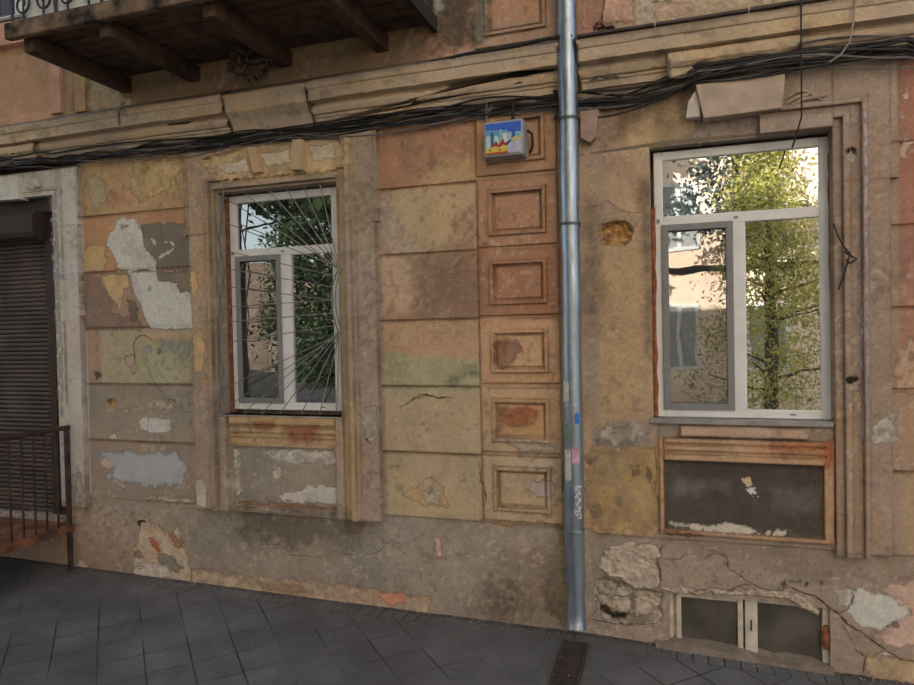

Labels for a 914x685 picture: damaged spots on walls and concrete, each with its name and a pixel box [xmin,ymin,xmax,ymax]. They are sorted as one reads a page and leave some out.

spalling [581,0,792,31]
peeling [80,217,206,372]
peeling [846,109,898,445]
crack [400,394,449,407]
peeling [100,450,208,508]
peeling [133,517,432,613]
peeling [267,448,336,479]
peeling [279,484,337,504]
spalling [593,541,820,626]
peeling [669,522,787,536]
crack [657,545,913,672]
peeling [831,579,914,684]